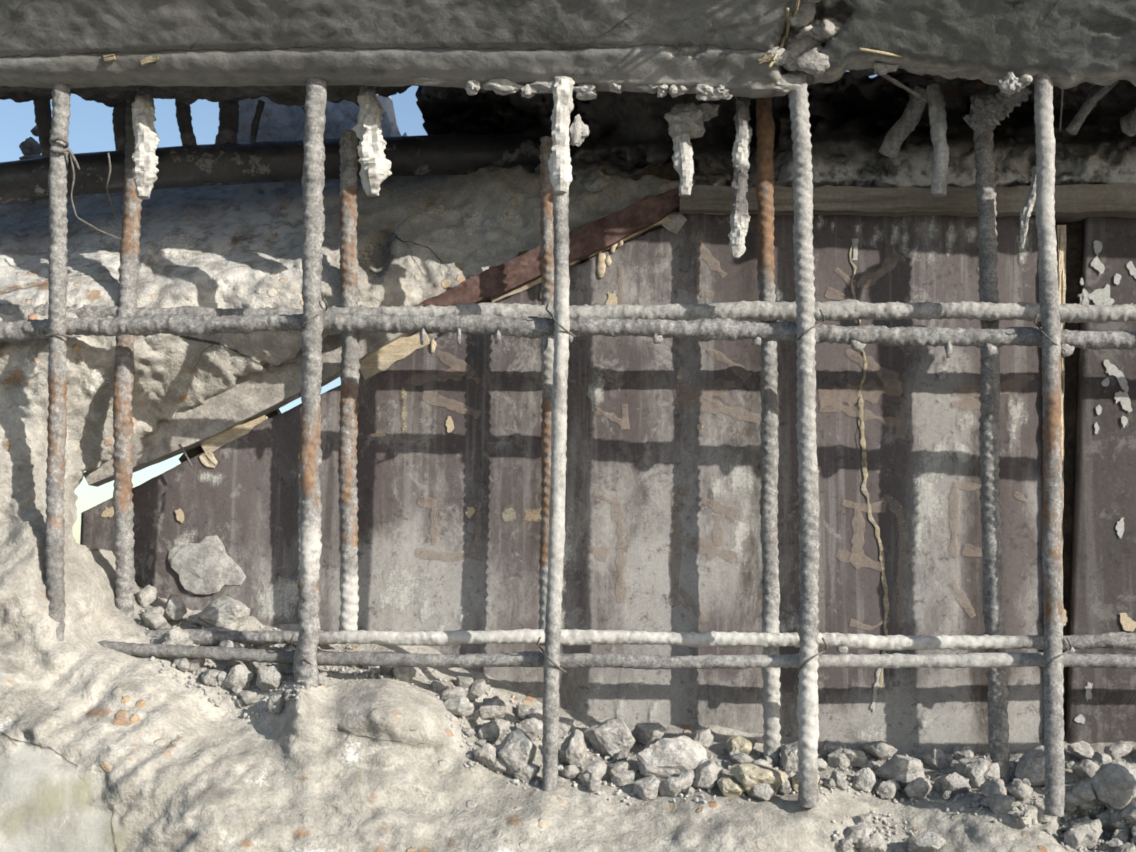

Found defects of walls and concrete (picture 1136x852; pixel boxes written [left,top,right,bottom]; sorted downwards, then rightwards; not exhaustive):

crack [0,0,844,75]
crack [179,336,297,381]
spalling [0,77,560,792]
spalling [322,70,1136,817]
crack [0,731,78,767]
crack [103,787,123,852]